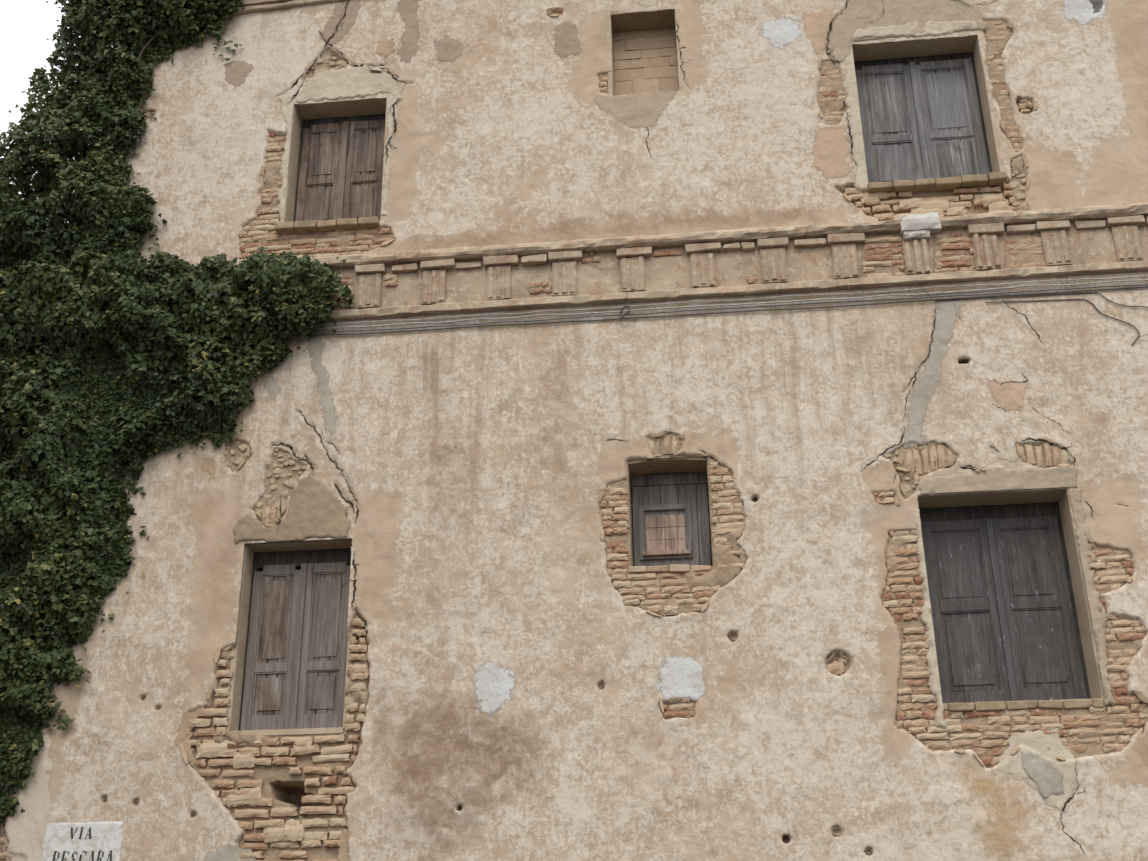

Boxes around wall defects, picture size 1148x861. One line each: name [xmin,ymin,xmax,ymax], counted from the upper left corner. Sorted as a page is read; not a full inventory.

spalling [239,133,394,260]
crack [282,0,413,161]
crack [826,0,884,169]
spalling [860,235,905,277]
spalling [839,20,1038,221]
crack [271,410,359,523]
spalling [598,432,758,618]
crack [861,305,961,479]
crack [931,408,1076,473]
spalling [882,530,1148,768]
spalling [181,614,370,861]
crack [1060,766,1085,854]